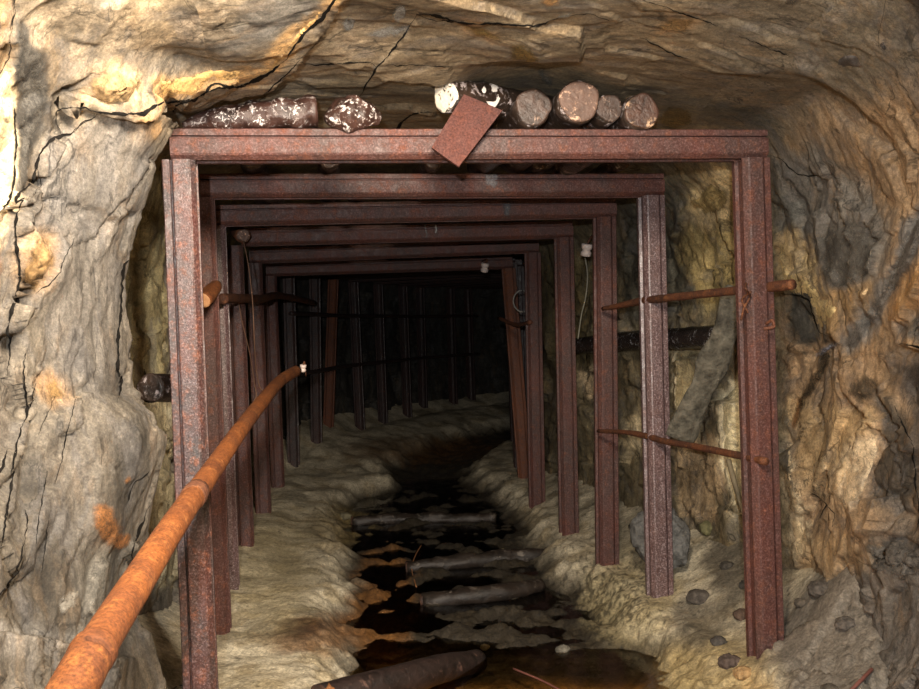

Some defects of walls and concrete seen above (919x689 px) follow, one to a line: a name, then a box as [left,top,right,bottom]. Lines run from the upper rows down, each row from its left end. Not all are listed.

rust [95,505,130,548]